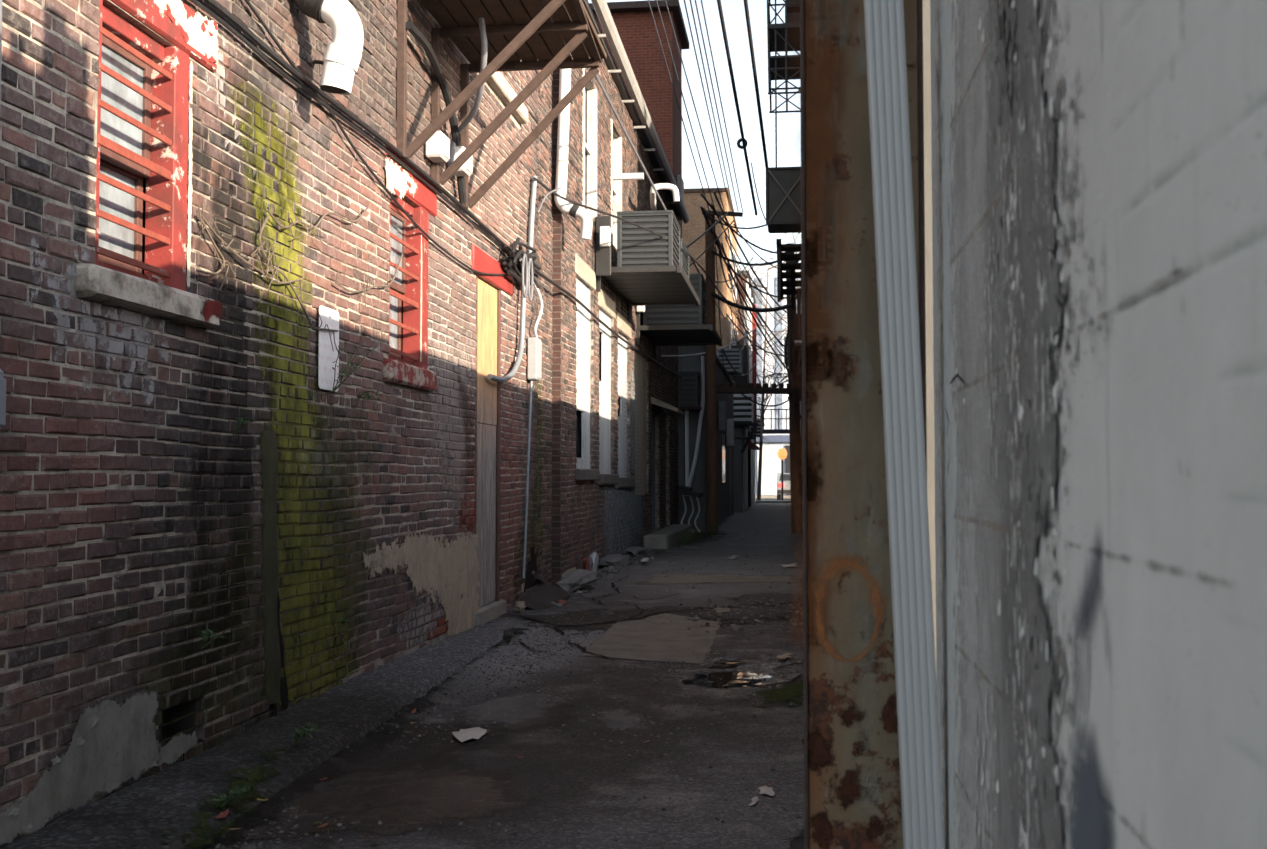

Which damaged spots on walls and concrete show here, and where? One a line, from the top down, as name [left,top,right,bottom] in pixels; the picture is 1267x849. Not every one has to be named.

peeling [385,157,418,198]
rust [798,230,823,278]
leakage [160,85,368,742]
rust [800,453,823,501]
rust [794,339,852,419]
peeling [932,0,1112,849]
peeling [363,499,480,640]
peeling [0,690,198,845]
rust [802,727,831,773]
rust [810,692,898,849]